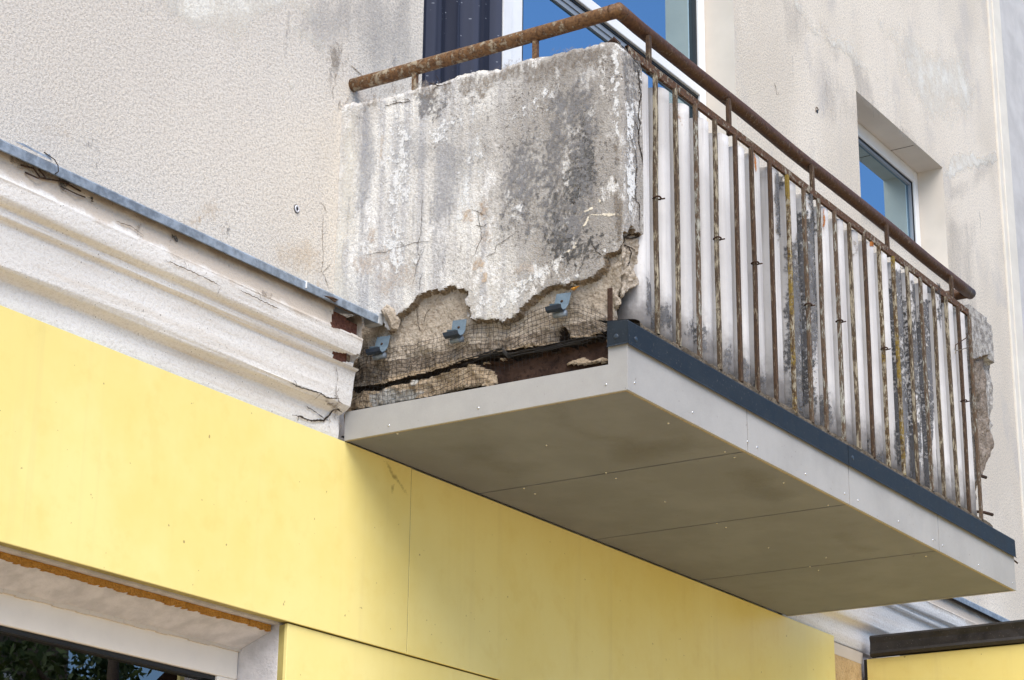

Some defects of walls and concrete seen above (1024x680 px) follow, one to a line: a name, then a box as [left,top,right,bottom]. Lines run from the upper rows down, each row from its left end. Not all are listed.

crack [370,192,429,329]
spalling [330,49,643,407]
damp [417,48,642,268]
crack [289,369,341,422]
spalling [969,354,994,499]